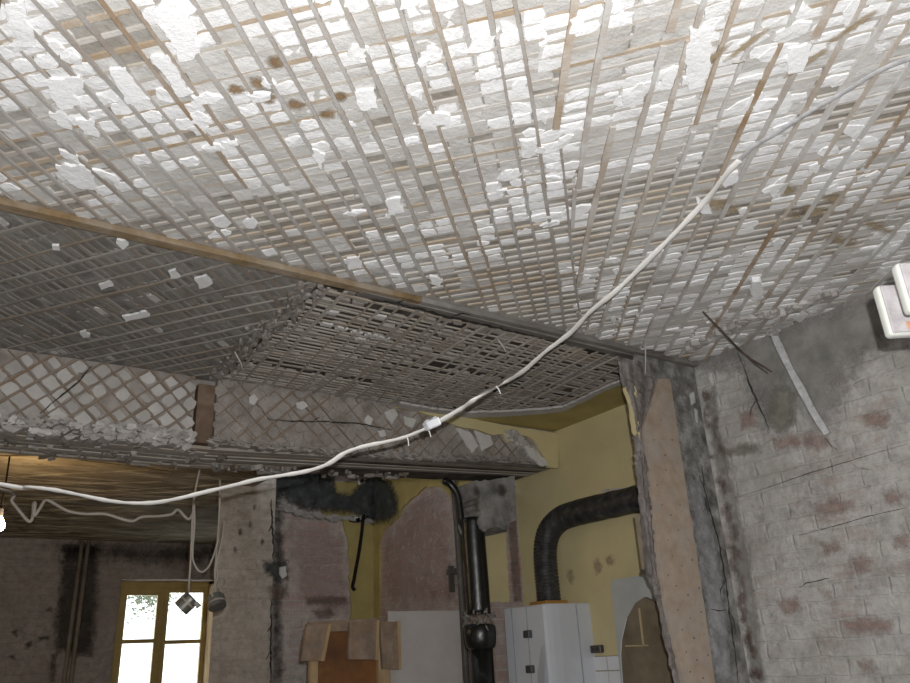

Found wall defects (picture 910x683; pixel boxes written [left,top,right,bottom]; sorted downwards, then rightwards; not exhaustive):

peeling [45,75,100,138]
peeling [109,66,150,104]
peeling [150,0,224,105]
peeling [355,87,378,111]
peeling [684,27,715,90]
peeling [55,162,98,190]
peeling [194,274,213,289]
peeling [122,310,150,322]
crack [737,352,769,429]
crack [735,437,906,498]
spalling [364,358,680,683]
crack [802,508,903,535]